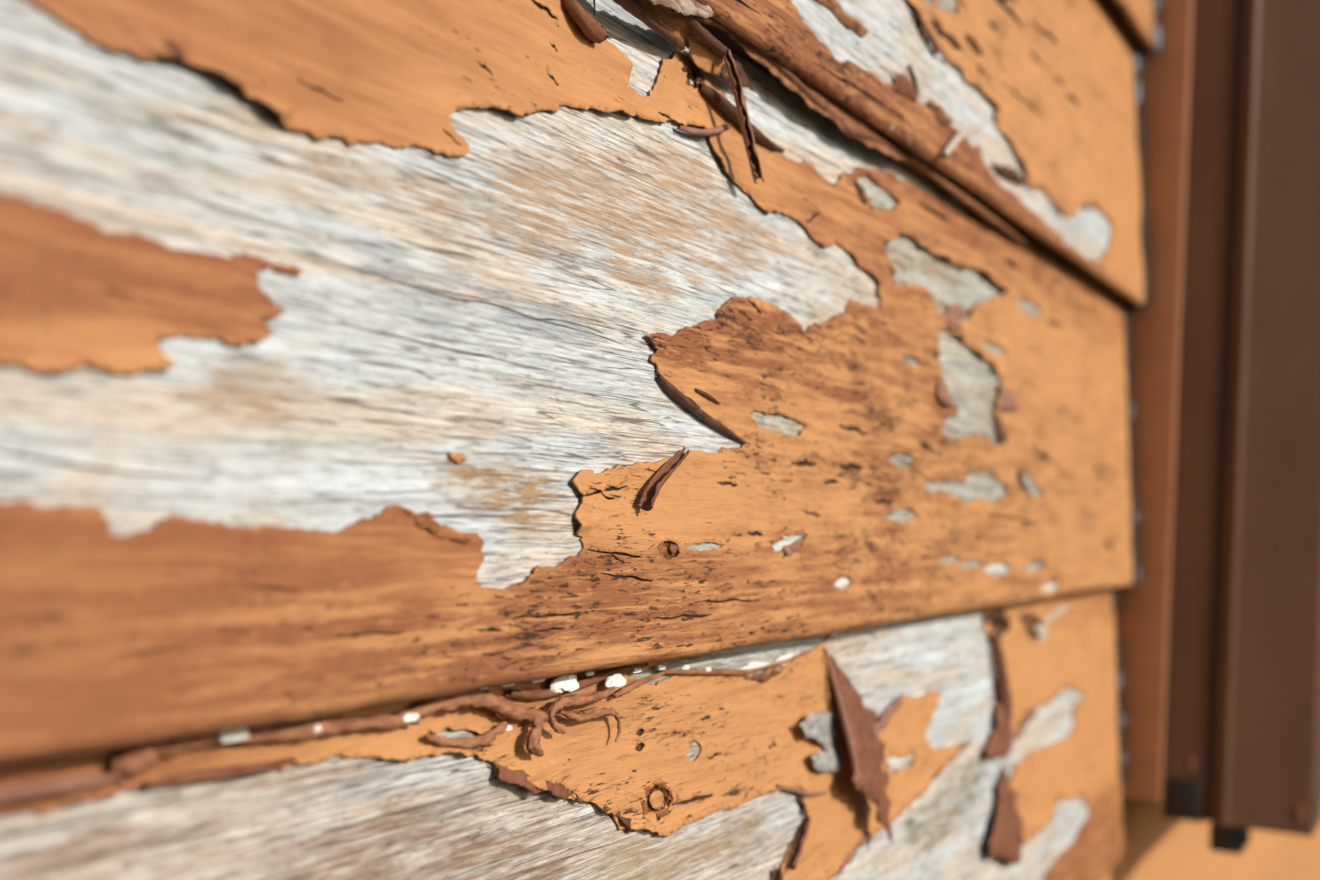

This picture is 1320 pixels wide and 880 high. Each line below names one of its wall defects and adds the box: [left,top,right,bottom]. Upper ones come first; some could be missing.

peeling [791,0,1112,261]
peeling [0,0,1019,589]
peeling [1015,300,1043,317]
peeling [925,470,1040,503]
peeling [937,556,1044,576]
peeling [0,727,827,880]
peeling [628,604,1088,880]